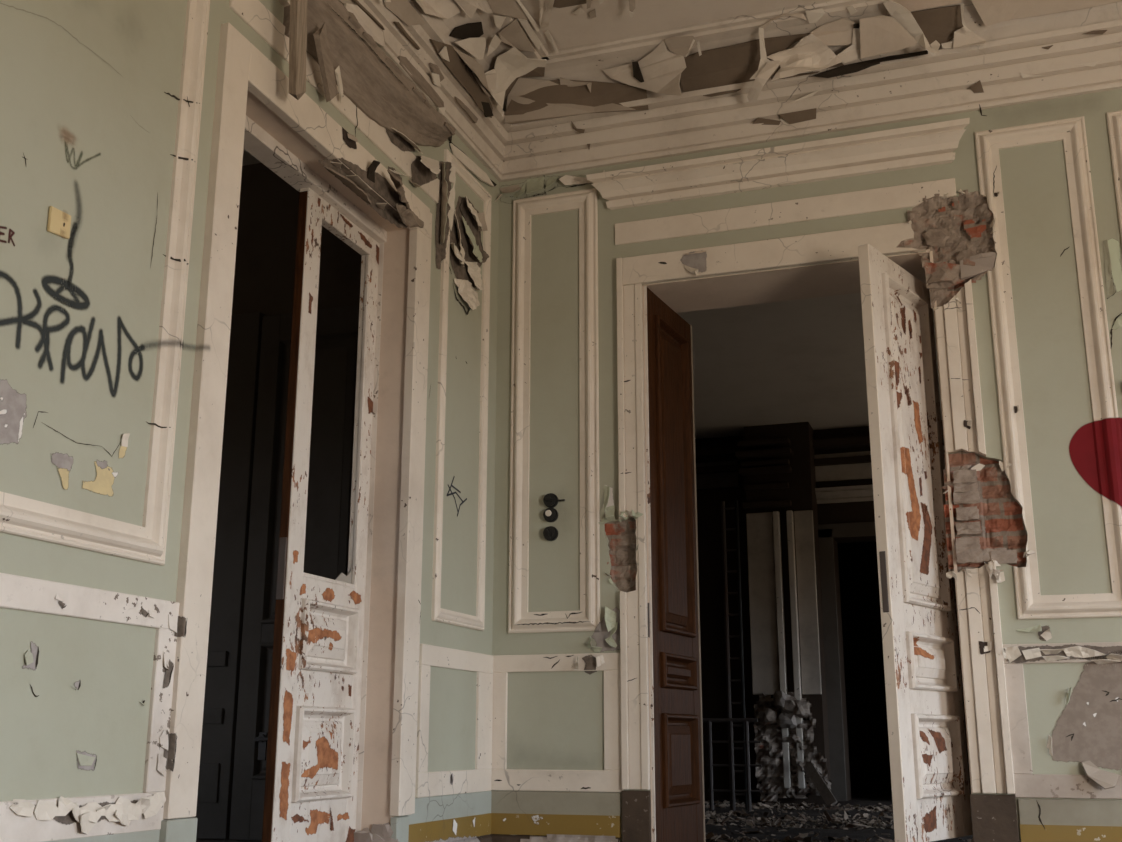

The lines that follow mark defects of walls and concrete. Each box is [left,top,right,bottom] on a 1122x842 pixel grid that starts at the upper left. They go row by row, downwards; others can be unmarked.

peeling [384,0,1122,124]
peeling [318,127,489,315]
flaking render [897,189,999,312]
flaking render [0,380,27,444]
flaking render [51,433,130,496]
flaking render [599,485,643,593]
flaking render [942,451,1036,583]
peeling [574,606,620,674]
flaking render [979,624,1122,789]
flaking render [425,818,480,842]
flaking render [520,815,618,842]